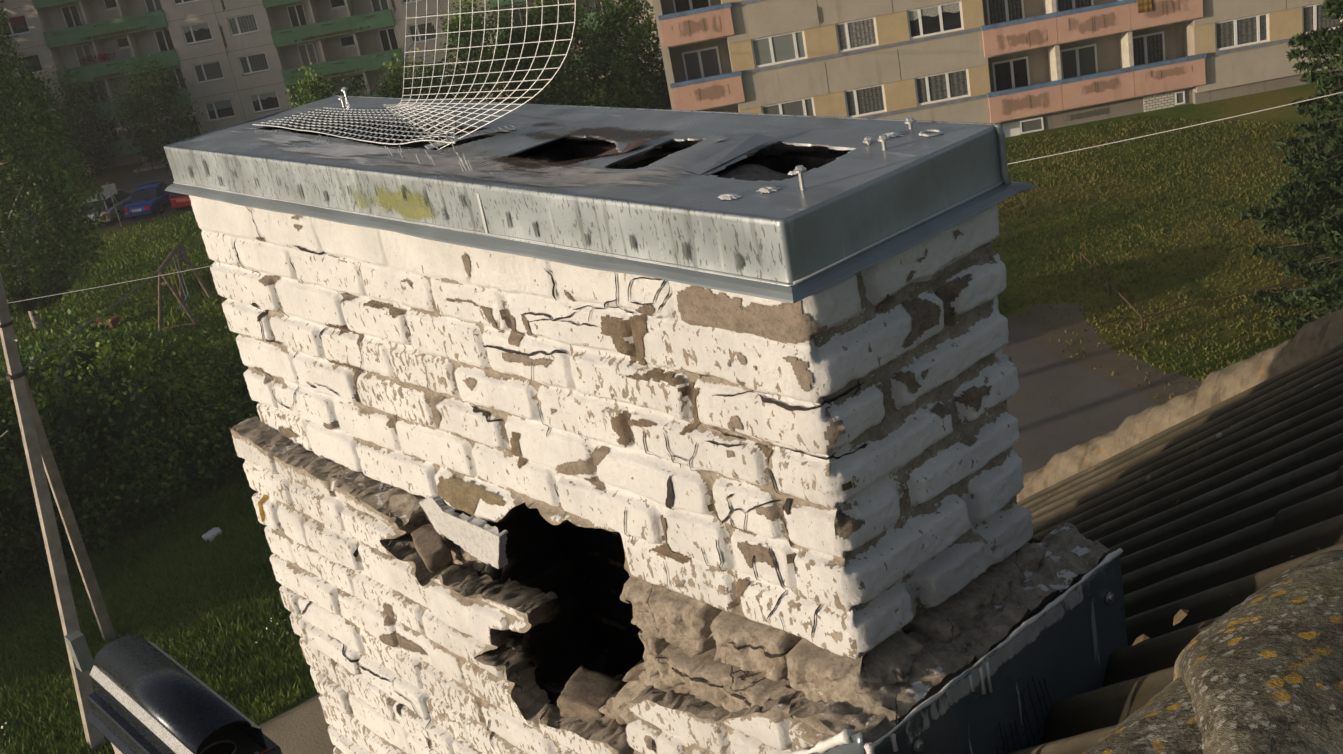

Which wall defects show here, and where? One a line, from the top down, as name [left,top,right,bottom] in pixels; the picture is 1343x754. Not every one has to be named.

peeling [877,248,979,348]
crack [482,268,670,442]
spalling [601,304,709,435]
flaking render [677,286,827,392]
crack [471,405,505,423]
flaking render [437,474,506,518]
peeling [649,515,690,588]
crack [643,382,869,658]
peeling [726,541,797,610]
peeling [834,508,865,540]
peeling [379,603,427,655]
crack [655,657,751,708]